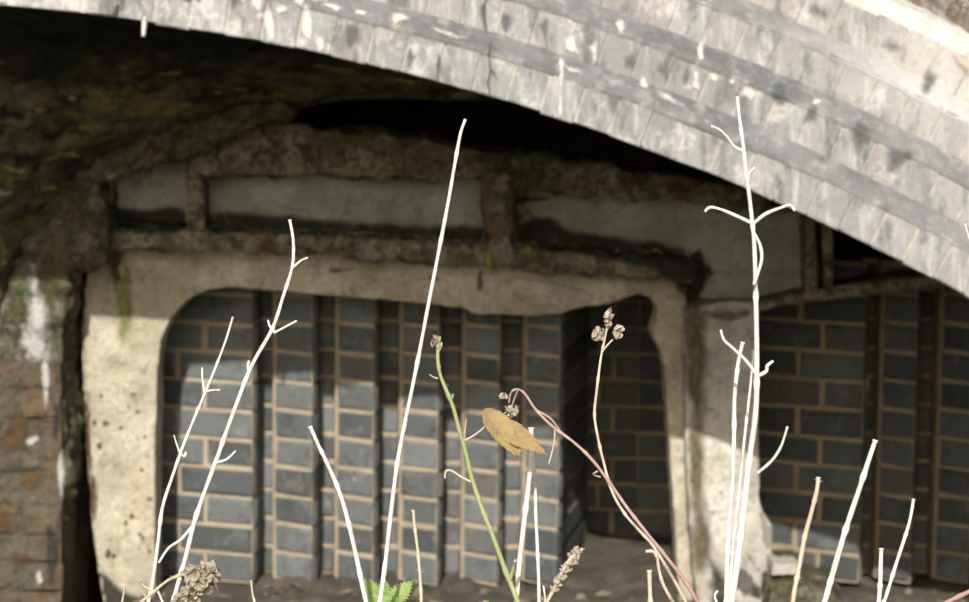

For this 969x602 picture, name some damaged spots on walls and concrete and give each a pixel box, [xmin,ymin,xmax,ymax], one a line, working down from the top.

crack [484,0,497,97]